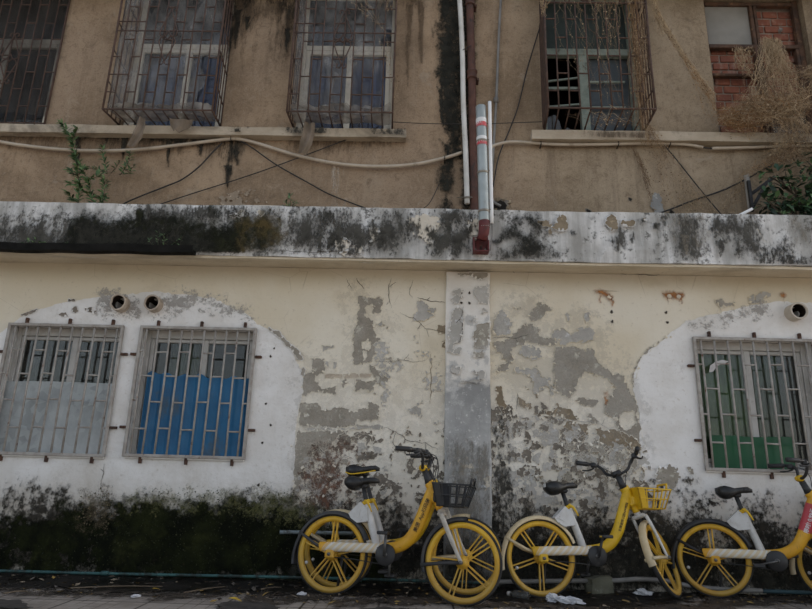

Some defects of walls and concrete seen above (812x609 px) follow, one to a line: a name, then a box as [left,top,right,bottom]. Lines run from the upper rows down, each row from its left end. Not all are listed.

water stain [0,0,481,258]
peeling [406,213,441,244]
peeling [466,218,479,235]
water stain [492,214,572,260]
peeling [537,214,569,235]
peeling [605,214,647,231]
water stain [642,213,812,264]
peeling [268,295,474,525]
peeling [412,271,695,538]
water stain [448,414,559,545]
water stain [0,481,77,568]
water stain [436,477,812,597]